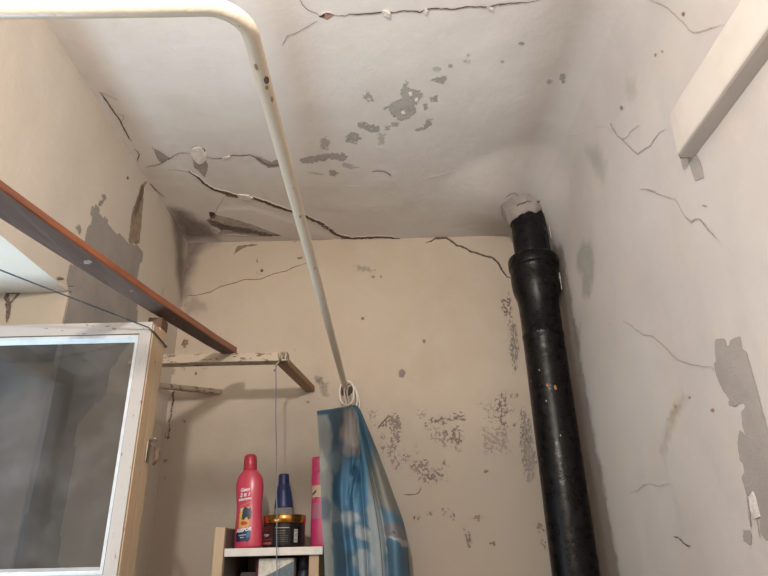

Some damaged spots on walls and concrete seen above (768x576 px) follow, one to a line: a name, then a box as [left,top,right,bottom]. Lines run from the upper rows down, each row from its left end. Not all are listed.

crack [282,0,538,46]
peeling [383,82,437,126]
crack [568,124,664,154]
crack [99,92,402,239]
flaking render [77,181,164,279]
flaking render [207,212,301,254]
crack [426,237,511,279]
crack [640,189,717,239]
flaking render [57,264,138,324]
crack [181,263,309,304]
flaking render [13,343,129,569]
flaking render [714,337,768,544]